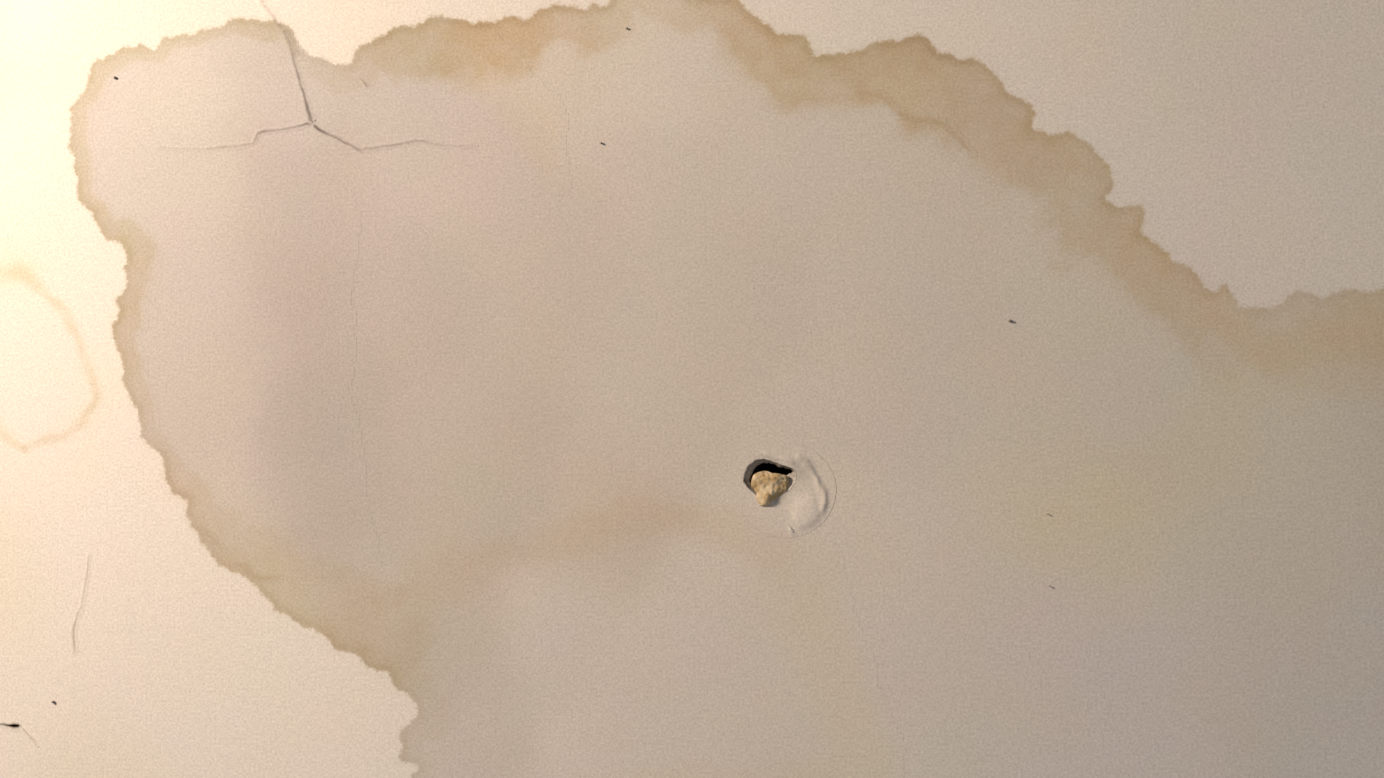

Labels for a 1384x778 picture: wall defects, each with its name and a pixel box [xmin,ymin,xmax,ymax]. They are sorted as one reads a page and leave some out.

leakage [60,9,279,430]
crack [155,0,478,155]
leakage [279,0,1384,387]
leakage [0,255,107,457]
leakage [267,174,379,608]
leakage [134,424,816,778]
leakage [549,529,906,778]
spalling [736,443,836,538]
leakage [967,329,1277,585]
leakage [1271,374,1384,441]